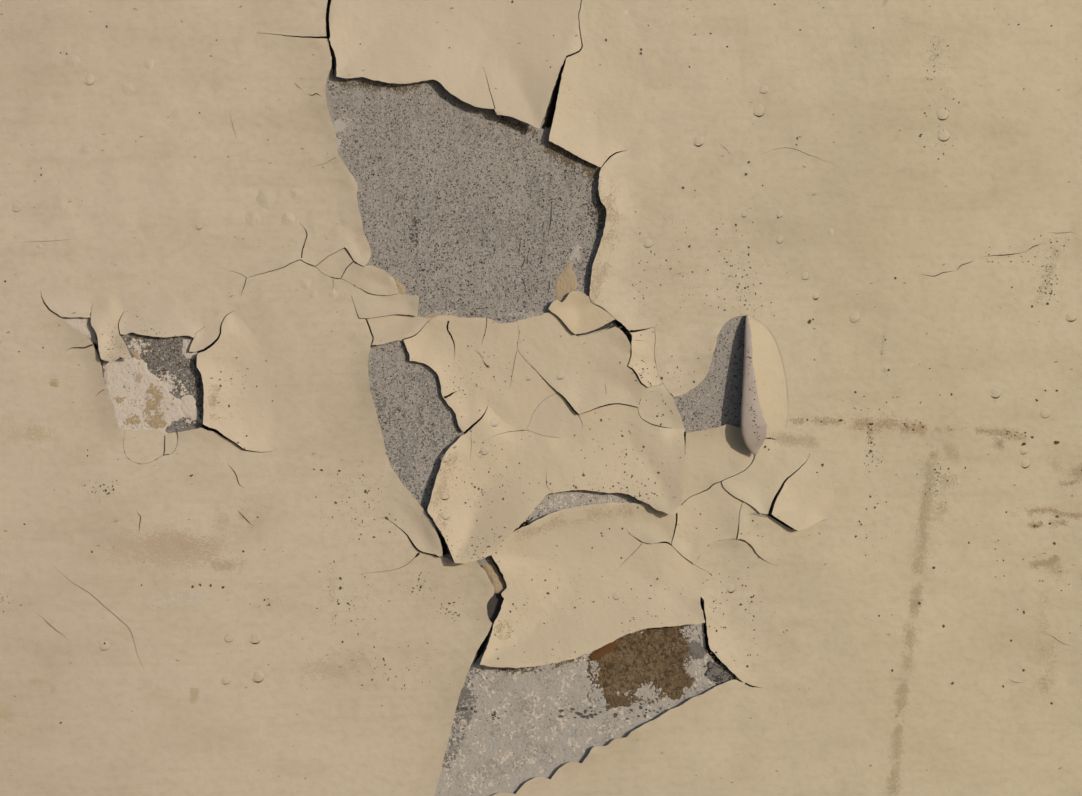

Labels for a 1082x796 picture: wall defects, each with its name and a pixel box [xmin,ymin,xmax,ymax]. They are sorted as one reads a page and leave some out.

peeling [41,281,275,464]
peeling [238,0,834,796]
crack [921,232,1073,277]
damp [886,443,966,796]